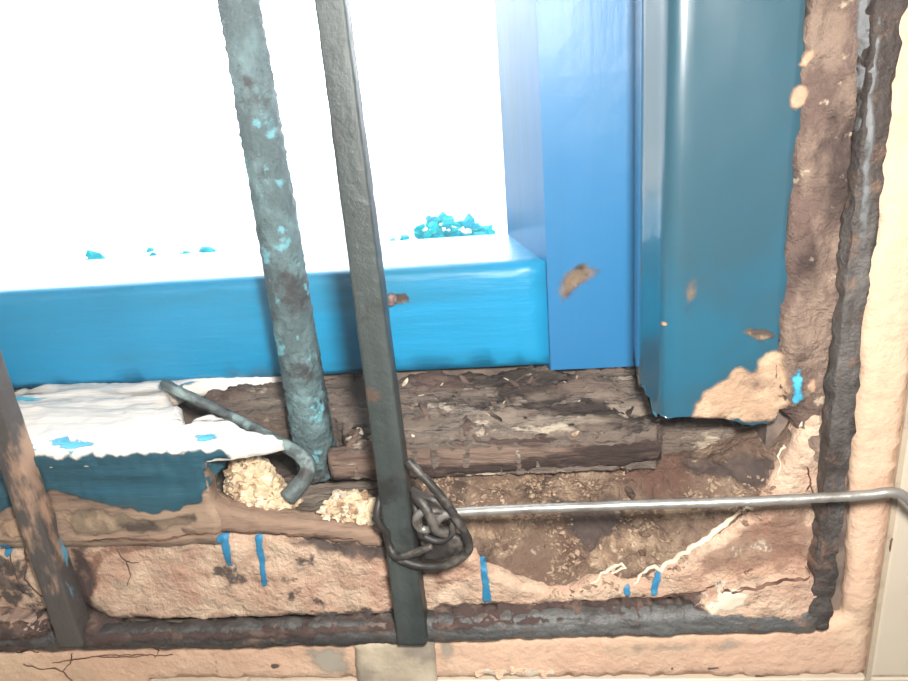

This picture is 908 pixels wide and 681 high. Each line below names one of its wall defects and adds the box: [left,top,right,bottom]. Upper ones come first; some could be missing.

peeling [562,264,593,297]
peeling [746,329,774,340]
spalling [399,352,816,597]
peeling [64,509,196,536]
mould [0,556,42,612]
crack [0,547,47,626]
crack [649,566,823,598]
crack [0,648,173,681]